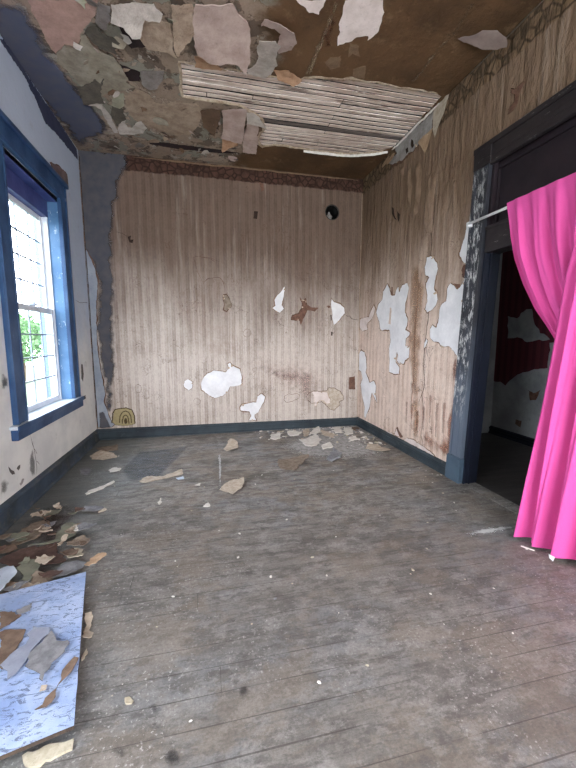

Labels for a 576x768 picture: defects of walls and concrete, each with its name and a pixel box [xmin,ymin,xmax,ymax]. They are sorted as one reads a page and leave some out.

flaking render [27,0,449,168]
peeling [79,166,115,428]
peeling [272,287,285,313]
peeling [331,298,345,324]
peeling [359,283,411,375]
peeling [424,255,464,356]
peeling [183,362,243,398]
peeling [239,393,266,421]
peeling [307,388,344,410]
peeling [358,349,377,418]